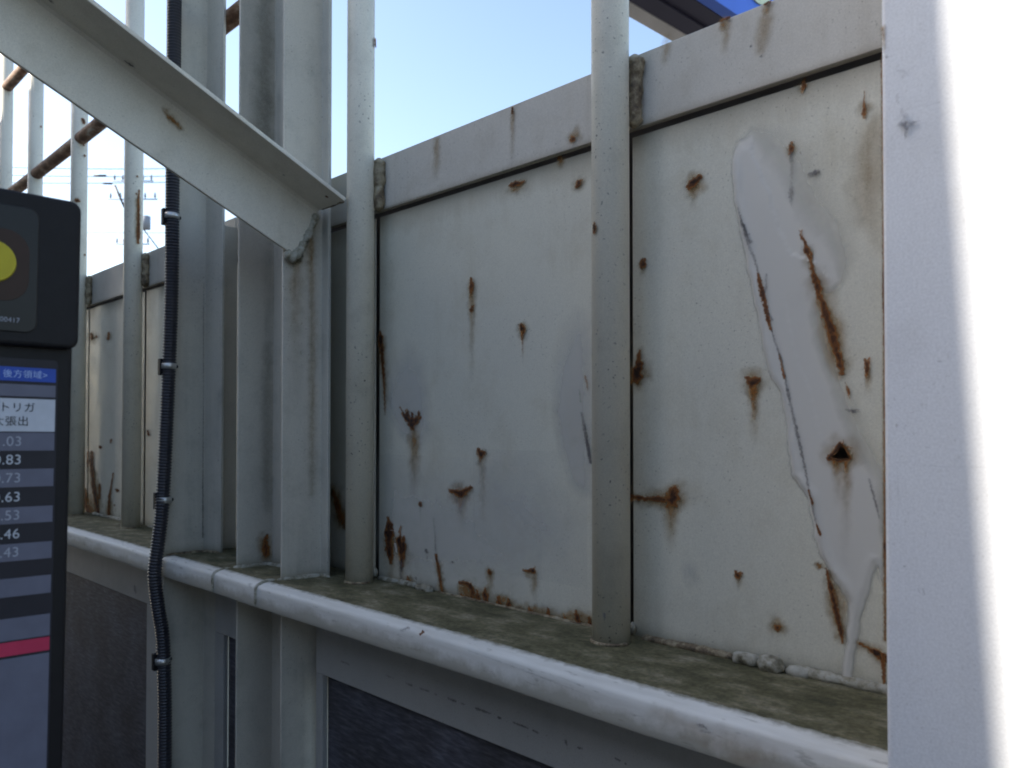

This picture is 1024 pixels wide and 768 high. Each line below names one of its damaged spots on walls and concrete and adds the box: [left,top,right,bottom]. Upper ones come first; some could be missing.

rust [686,174,702,192]
crack [740,215,752,243]
rust [799,229,850,396]
rust [630,350,645,385]
crack [757,270,821,536]
rust [85,439,119,516]
rust [449,485,473,512]
rust [458,569,512,607]
rust [528,606,592,625]
rust [815,563,845,644]